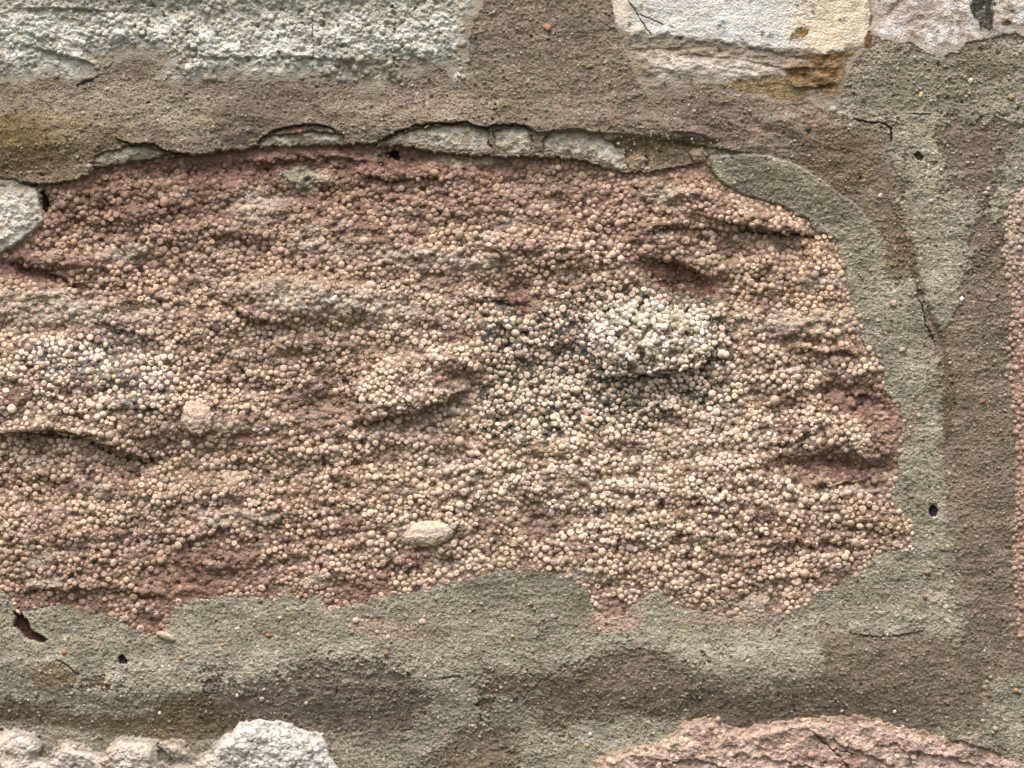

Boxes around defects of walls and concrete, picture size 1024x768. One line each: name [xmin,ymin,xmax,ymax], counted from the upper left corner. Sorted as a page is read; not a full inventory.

crack [379,121,532,141]
crack [854,118,893,141]
peeling [95,146,164,167]
peeling [229,124,648,173]
peeling [688,146,710,164]
spalling [0,259,86,288]
spalling [645,261,716,298]
spalling [295,397,340,426]
spalling [828,386,901,434]
spalling [787,442,867,483]
spalling [525,508,562,537]
spalling [149,544,245,602]